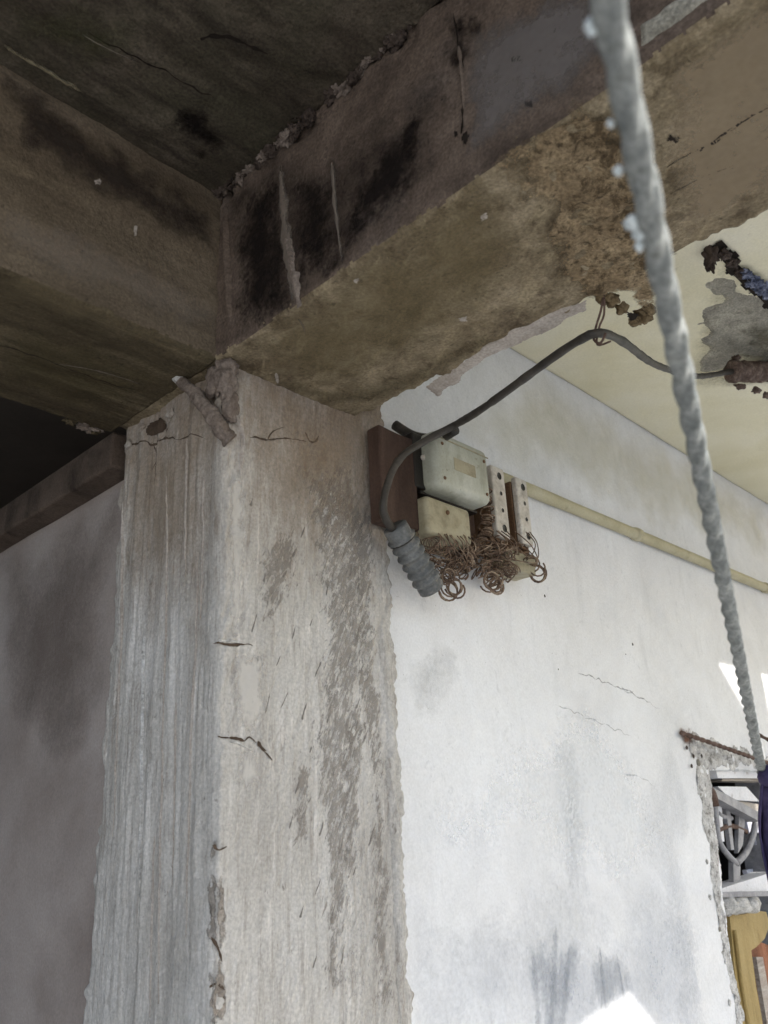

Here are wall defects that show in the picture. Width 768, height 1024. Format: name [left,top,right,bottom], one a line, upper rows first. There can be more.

crack [85,32,212,96]
leakage [178,111,218,157]
leakage [352,120,419,230]
leakage [240,184,337,334]
peeling [698,240,768,382]
spalling [124,407,175,450]
crack [132,422,205,469]
crack [250,427,319,443]
crack [213,639,253,647]
crack [218,736,272,787]
spalling [689,731,768,1024]
spalling [207,875,226,1024]